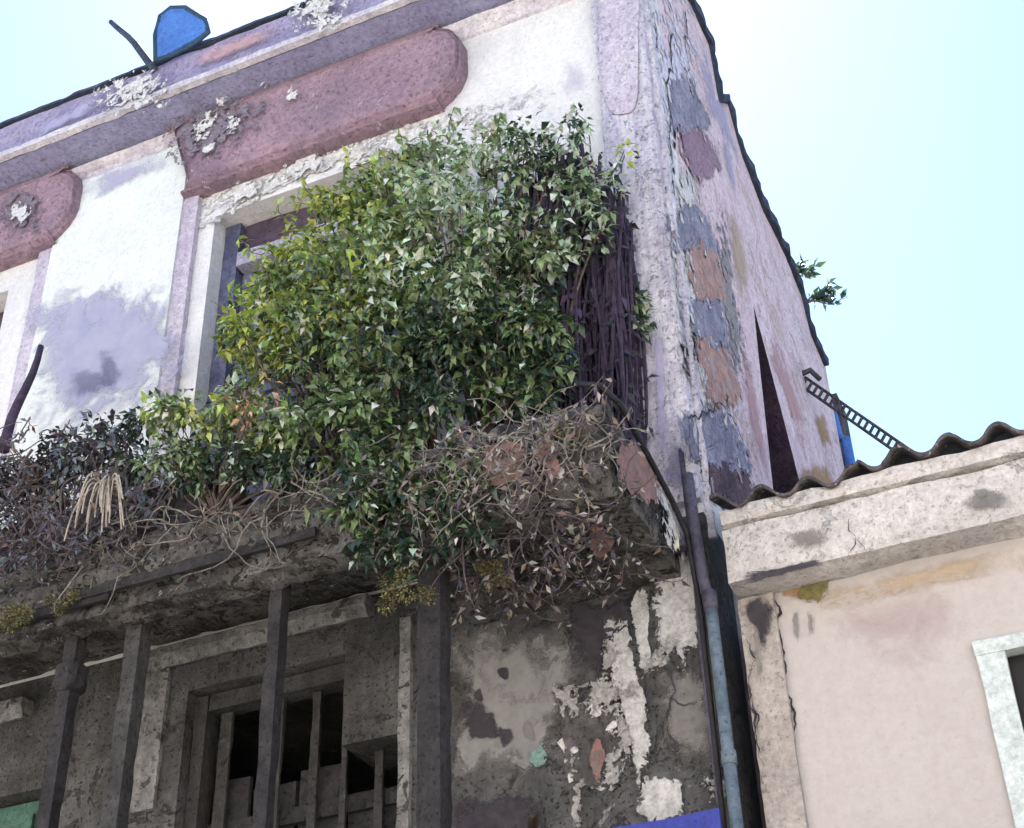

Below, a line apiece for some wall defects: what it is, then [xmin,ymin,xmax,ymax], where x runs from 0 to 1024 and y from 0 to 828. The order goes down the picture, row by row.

spalling [287,0,353,33]
spalling [92,70,173,119]
peeling [155,82,267,165]
spalling [198,85,555,228]
flaking render [645,0,756,511]
leakage [28,286,187,429]
leakage [790,530,822,546]
leakage [969,489,1003,509]
spalling [548,436,701,827]
leakage [746,597,772,675]
crack [775,601,797,731]
leakage [793,613,812,637]